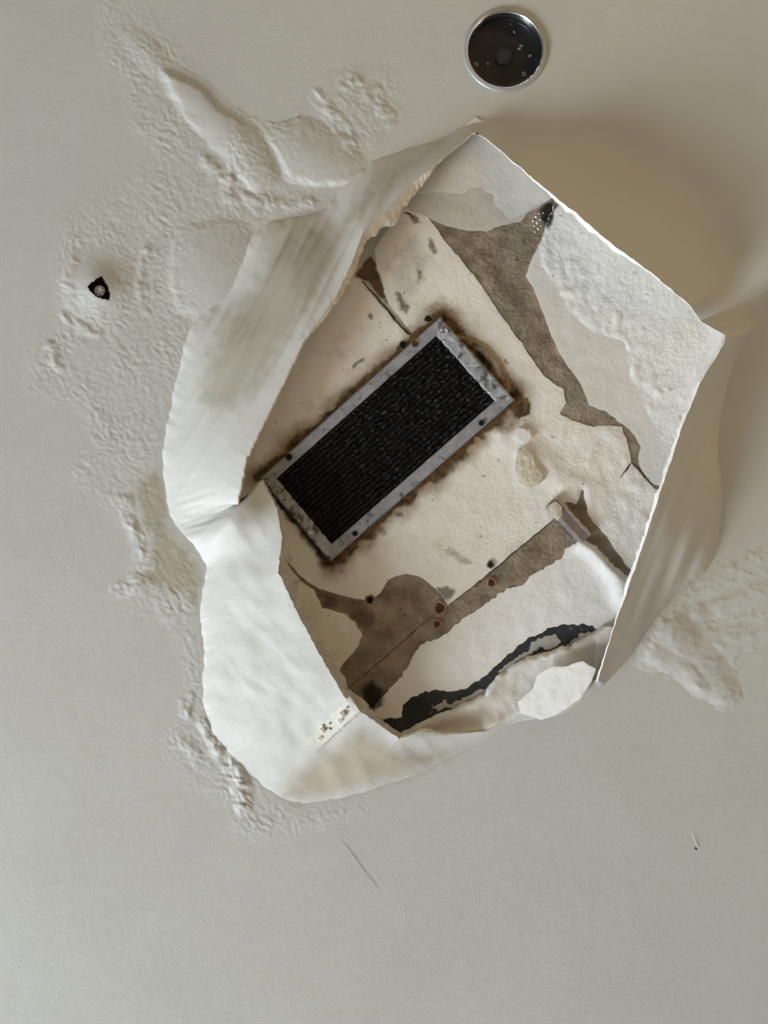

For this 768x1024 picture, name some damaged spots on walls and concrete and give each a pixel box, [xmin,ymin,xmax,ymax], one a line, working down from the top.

leakage [540,203,558,228]
leakage [251,308,451,484]
peeling [162,107,762,803]
leakage [437,587,454,600]
leakage [363,680,383,711]